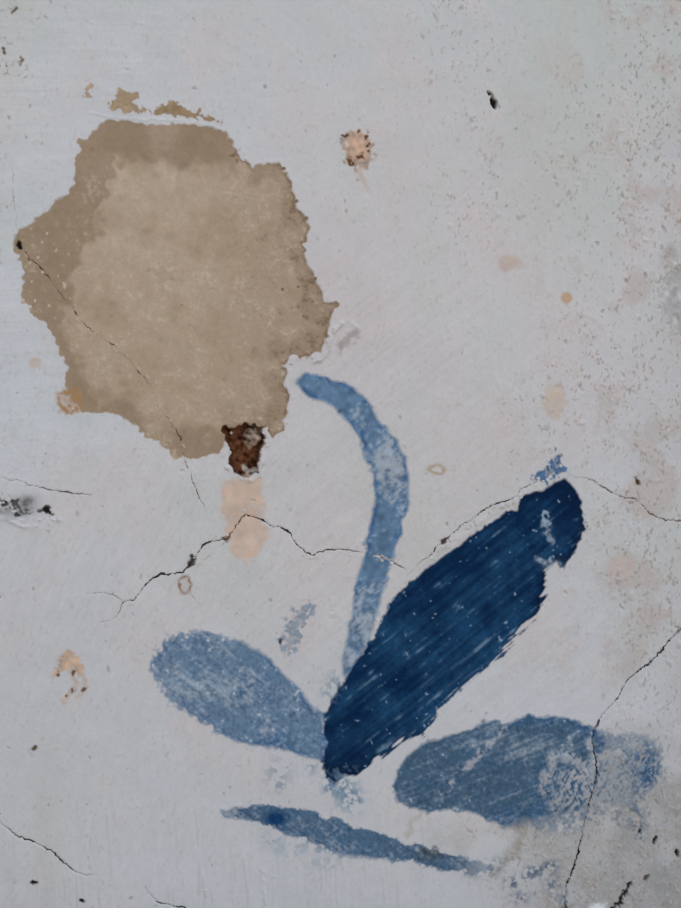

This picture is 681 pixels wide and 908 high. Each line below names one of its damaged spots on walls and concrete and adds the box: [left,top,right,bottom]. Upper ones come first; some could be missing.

peeling [12,82,363,483]
crack [94,480,545,622]
crack [573,476,681,522]
crack [564,628,681,908]
crack [0,821,94,876]